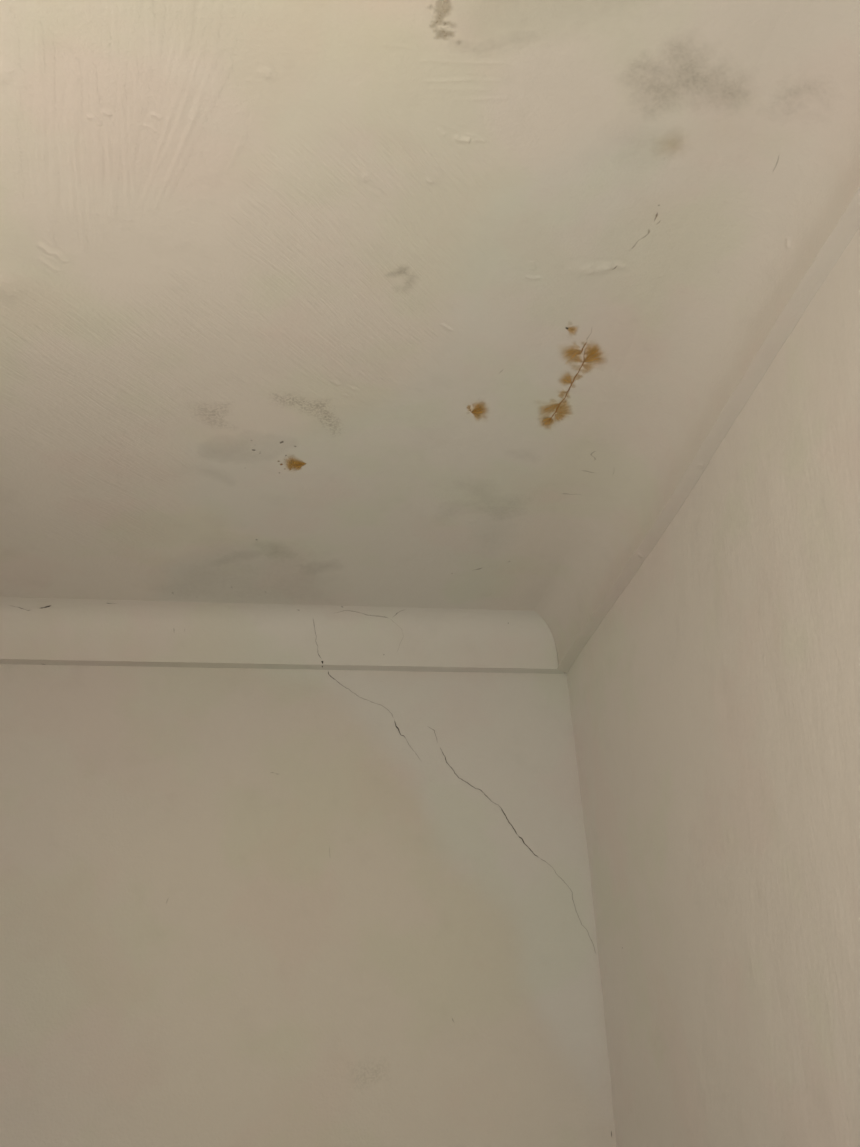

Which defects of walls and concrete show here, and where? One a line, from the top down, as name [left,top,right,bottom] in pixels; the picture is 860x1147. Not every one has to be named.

corrosion [543,343,599,425]
crack [442,752,538,857]